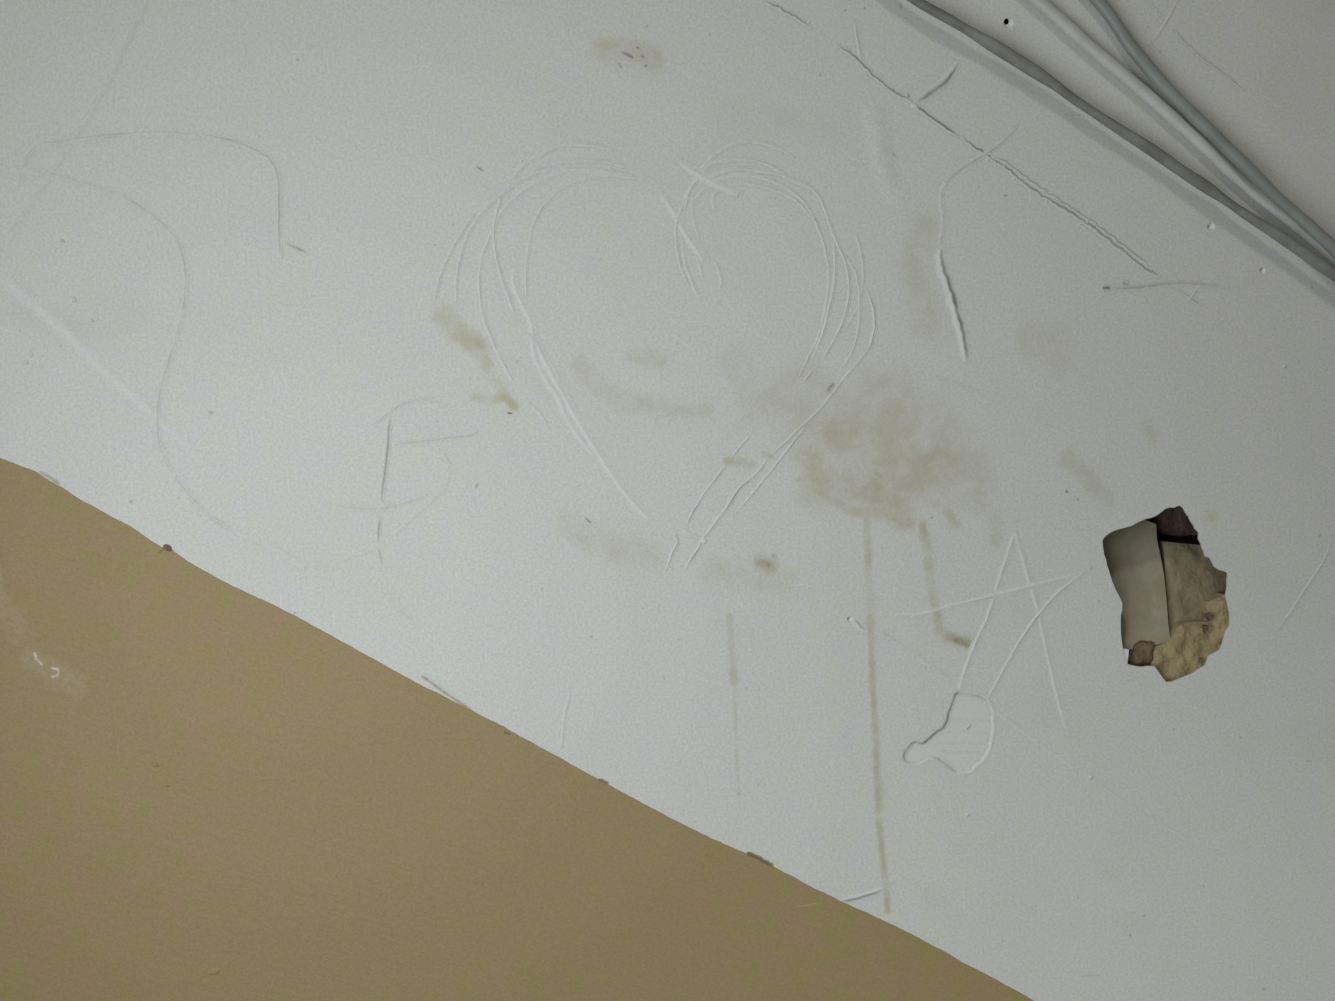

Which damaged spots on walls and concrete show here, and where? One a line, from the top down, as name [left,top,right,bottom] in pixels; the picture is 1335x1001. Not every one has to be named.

damp [544,198,1010,917]
spalling [1103,505,1230,682]